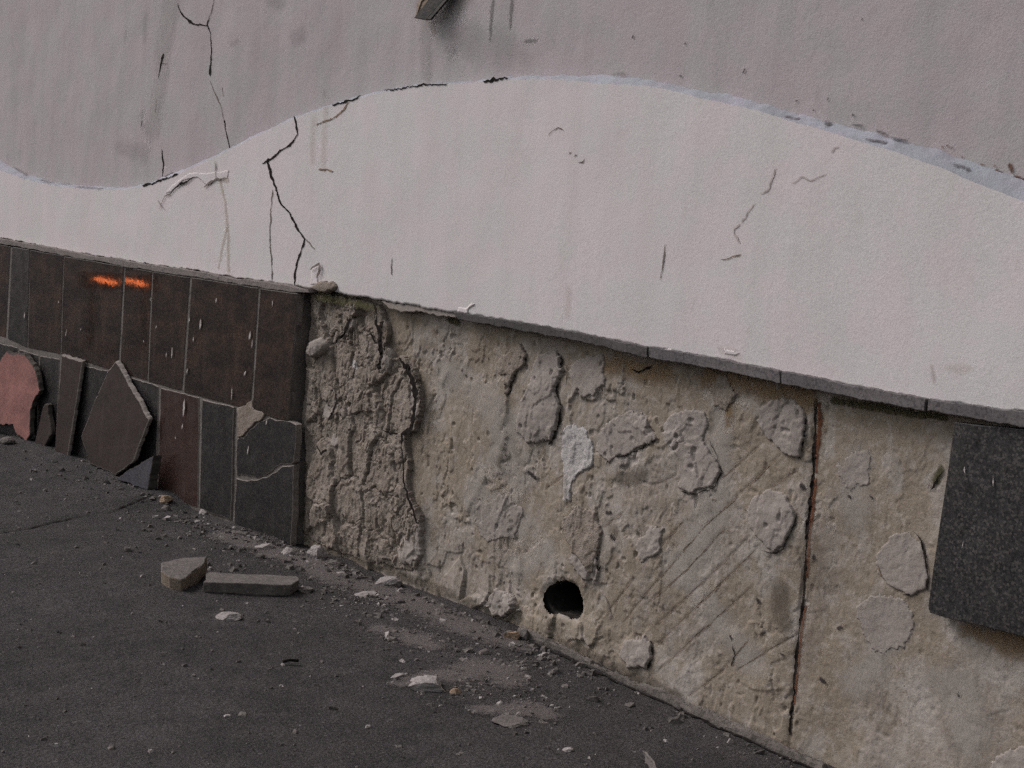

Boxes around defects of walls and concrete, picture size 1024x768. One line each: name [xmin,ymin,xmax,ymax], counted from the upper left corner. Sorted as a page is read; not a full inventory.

crack [178,0,230,148]
crack [142,155,178,187]
spalling [304,263,425,571]
corrosion [806,402,823,578]
spalling [543,579,584,620]
crack [520,398,817,768]